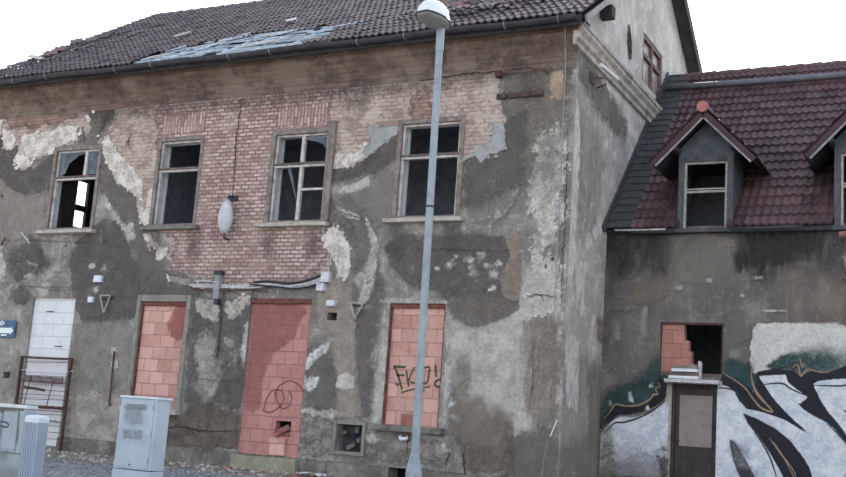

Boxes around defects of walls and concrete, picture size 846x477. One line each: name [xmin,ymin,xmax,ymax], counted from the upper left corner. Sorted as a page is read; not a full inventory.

damp [69,151,306,409]
spalling [0,74,508,322]
spalling [380,298,450,353]
damp [303,50,627,420]
damp [507,232,682,477]
damp [735,231,838,321]